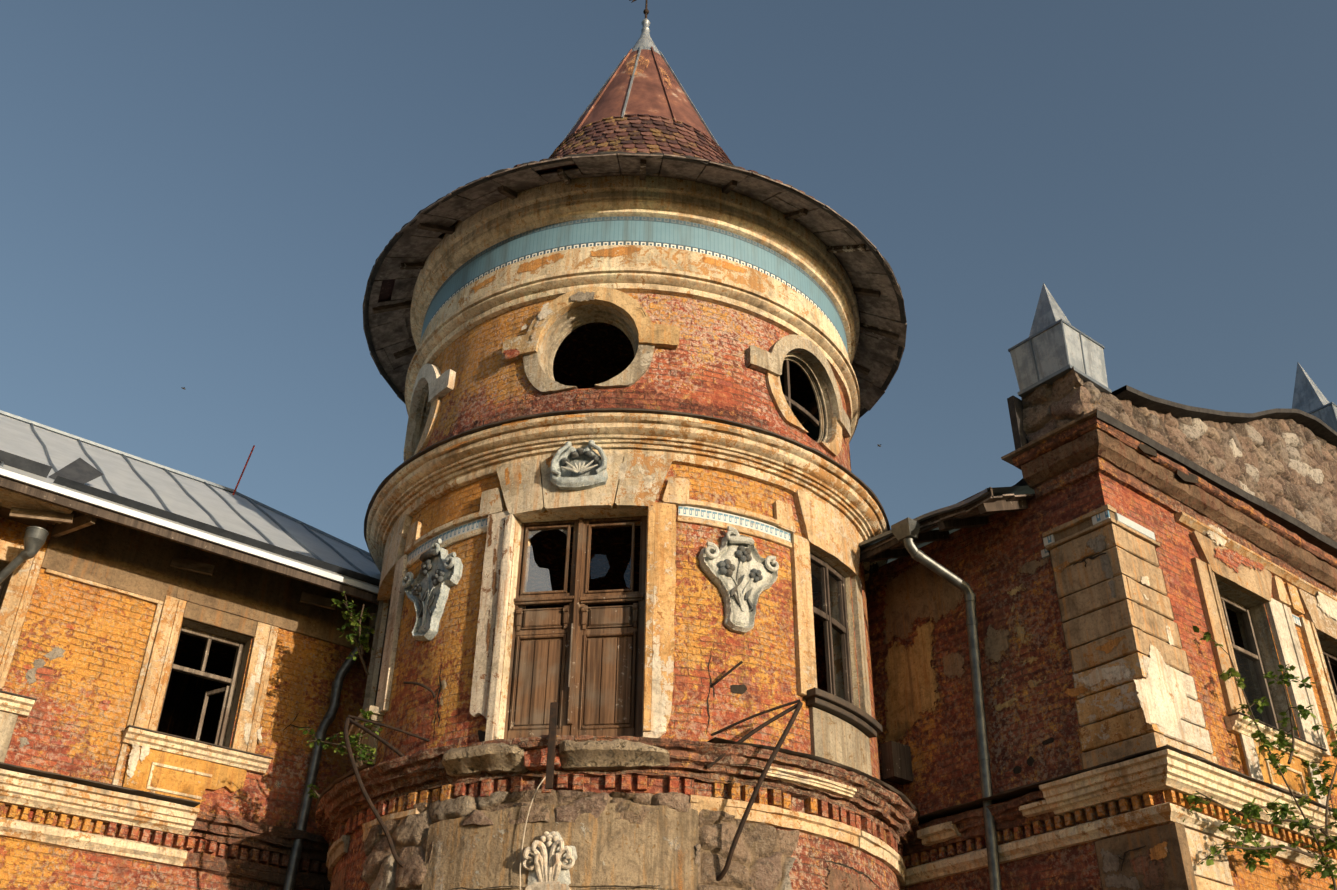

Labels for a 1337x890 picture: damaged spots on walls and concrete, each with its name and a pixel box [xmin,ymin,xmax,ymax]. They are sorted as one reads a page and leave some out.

peeling [517,253,566,273]
flaking render [570,292,595,302]
peeling [590,246,641,257]
peeling [702,256,745,273]
peeling [8,647,150,784]
peeling [486,514,505,669]
peeling [651,586,668,736]
flaking render [883,619,966,742]
flaking render [984,557,1070,690]